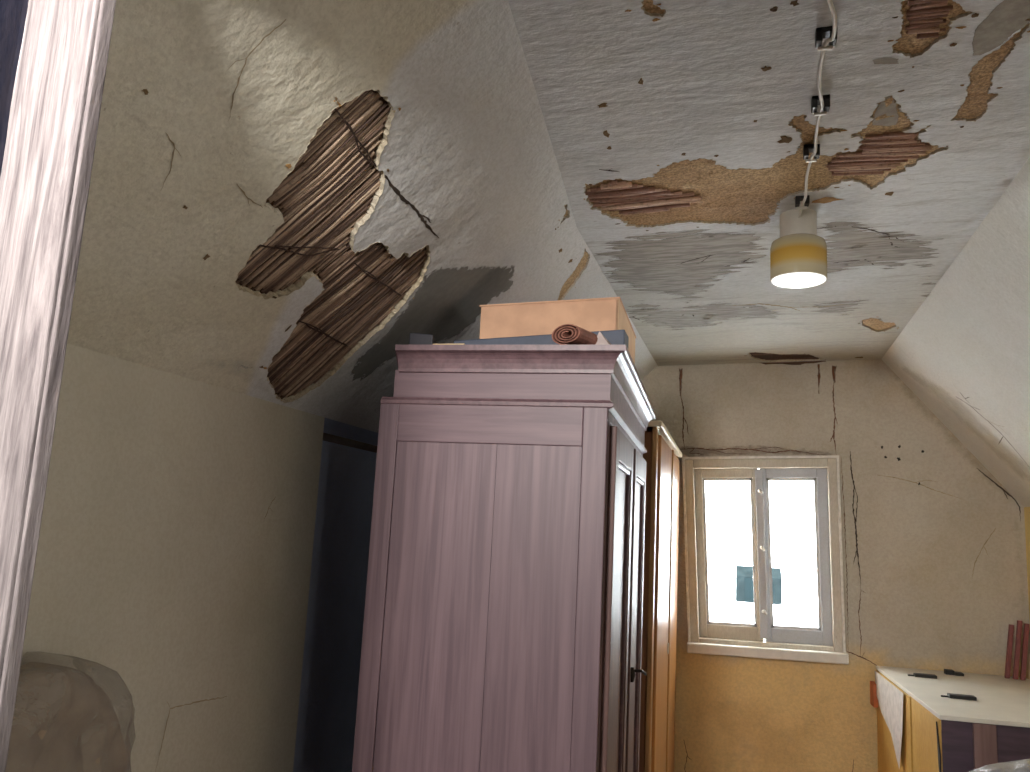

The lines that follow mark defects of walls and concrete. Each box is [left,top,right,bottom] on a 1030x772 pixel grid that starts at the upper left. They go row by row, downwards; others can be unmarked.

crack [228,19,286,121]
peeling [625,0,666,22]
flaking render [888,0,1030,128]
flaking render [235,89,430,403]
crack [385,175,439,238]
flaking render [557,90,949,332]
crack [680,382,877,666]